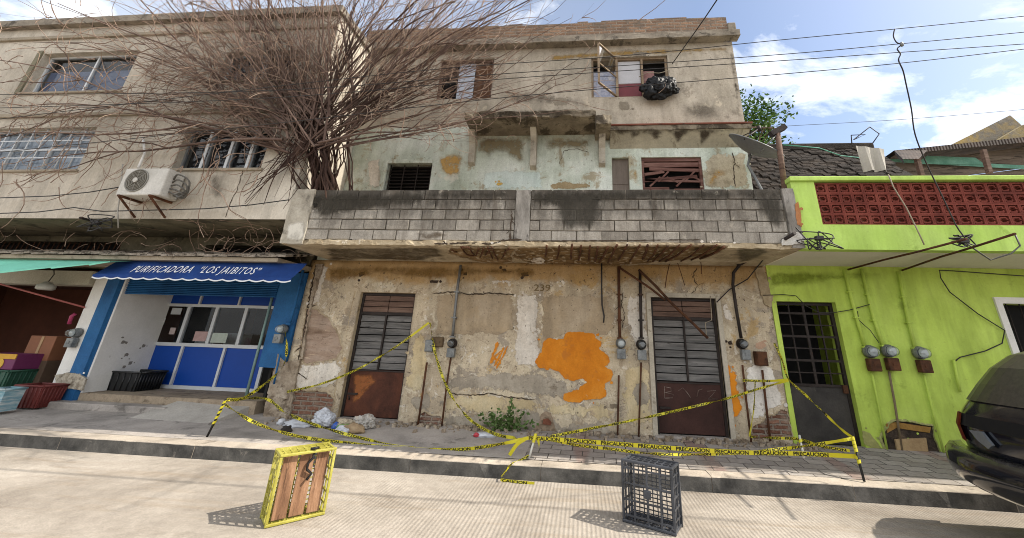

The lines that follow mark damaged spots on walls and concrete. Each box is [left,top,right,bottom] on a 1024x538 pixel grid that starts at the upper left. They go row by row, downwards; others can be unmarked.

peeling [483,167,590,190]
leakage [313,194,422,215]
leakage [534,192,651,227]
crack [434,289,514,298]
flaking render [291,263,344,418]
peeling [417,240,736,434]
corrosion [354,375,375,401]
crack [452,393,535,404]
peeling [728,340,793,442]